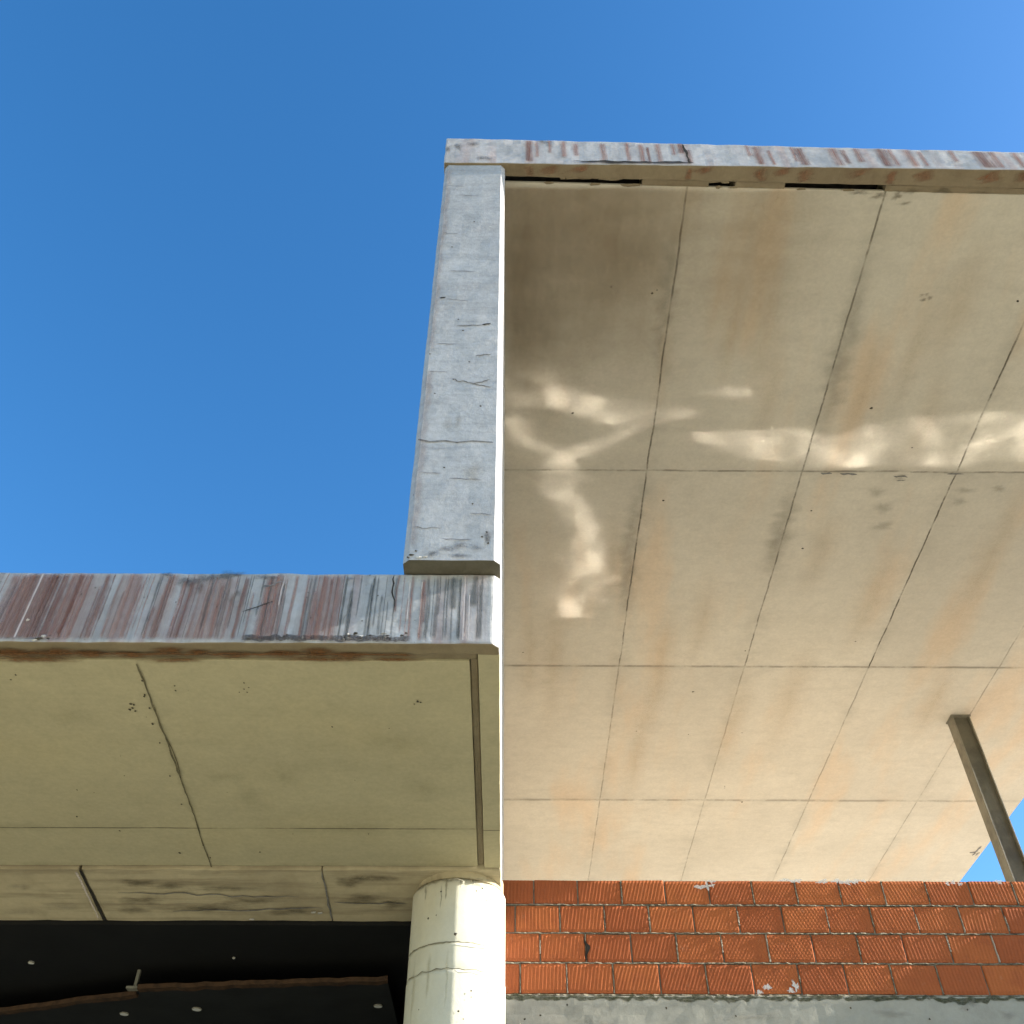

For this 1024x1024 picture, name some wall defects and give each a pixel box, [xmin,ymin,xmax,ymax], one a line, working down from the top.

rust [526,141,586,173]
crack [576,144,693,163]
rust [745,146,787,179]
rust [877,149,929,183]
rust [973,152,1004,182]
crack [434,354,491,387]
crack [418,437,493,445]
rust [0,575,413,662]
crack [136,664,212,867]
crack [76,870,406,920]
crack [407,941,497,982]